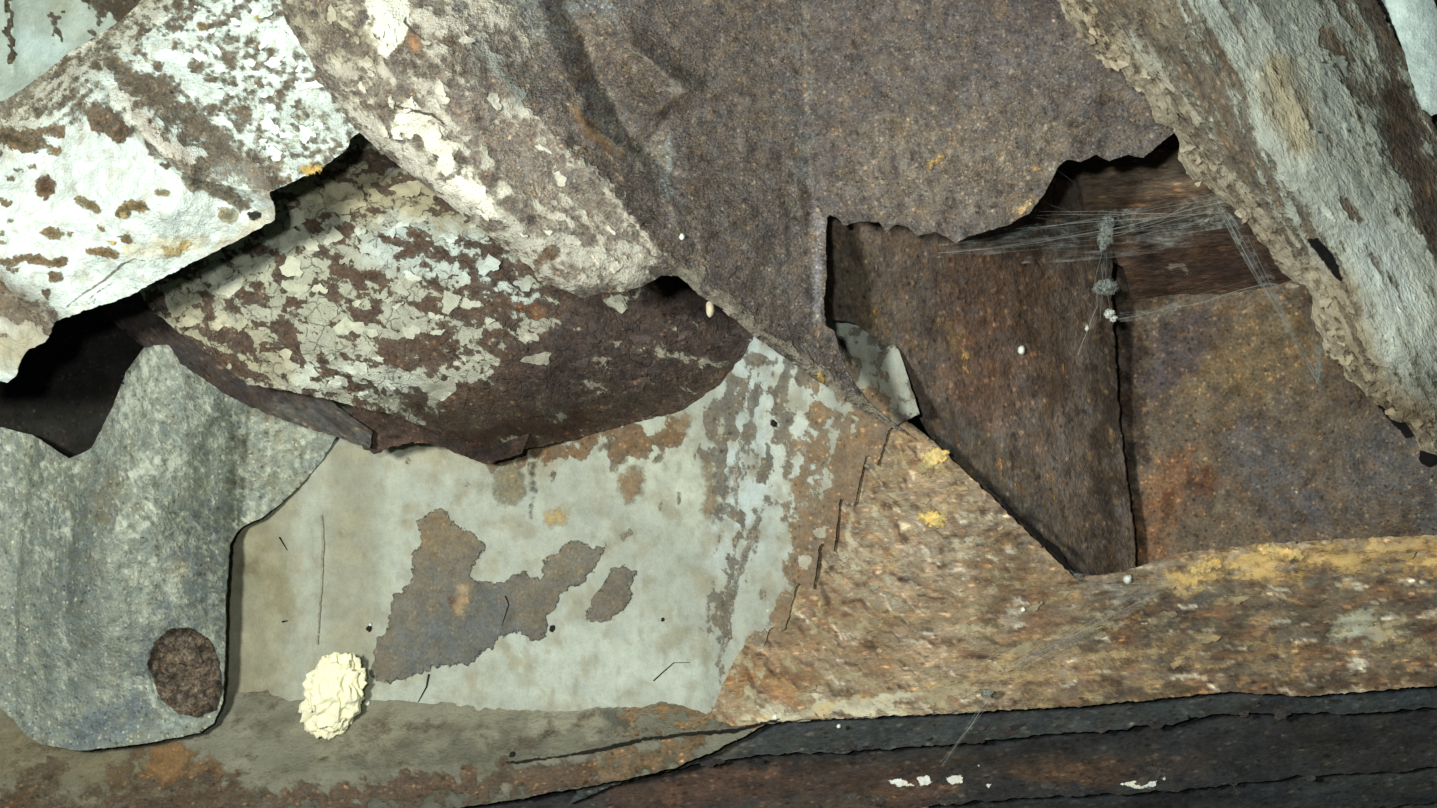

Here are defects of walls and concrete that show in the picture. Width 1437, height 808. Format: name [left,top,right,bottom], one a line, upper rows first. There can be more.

peeling [188,1,324,162]
peeling [1382,0,1437,116]
peeling [168,168,430,341]
corrosion [299,162,323,176]
peeling [279,259,422,396]
peeling [402,254,501,339]
peeling [418,355,493,401]
peeling [438,171,583,250]
peeling [518,332,556,365]
peeling [369,508,637,684]
corrosion [710,421,1437,727]
corrosion [106,696,192,791]